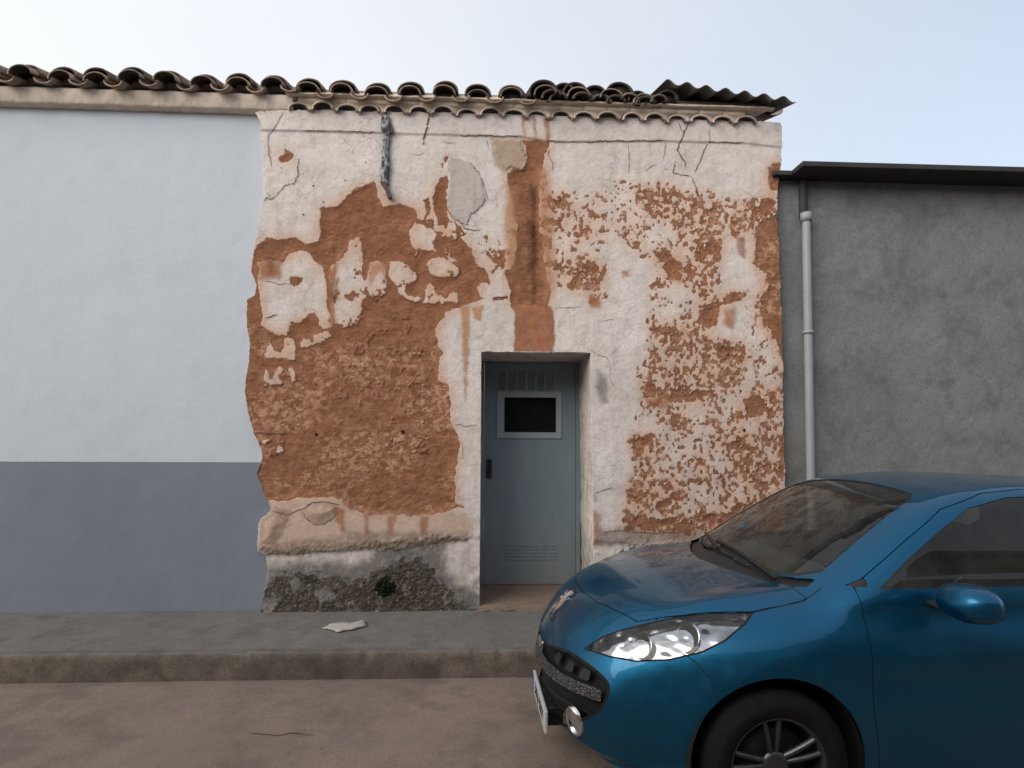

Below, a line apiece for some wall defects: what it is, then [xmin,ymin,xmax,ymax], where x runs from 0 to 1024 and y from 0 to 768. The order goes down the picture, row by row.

crack [264,113,376,201]
crack [548,120,752,199]
peeling [245,139,785,553]
crack [273,501,340,525]
flaking render [258,534,472,613]
water stain [264,543,479,609]